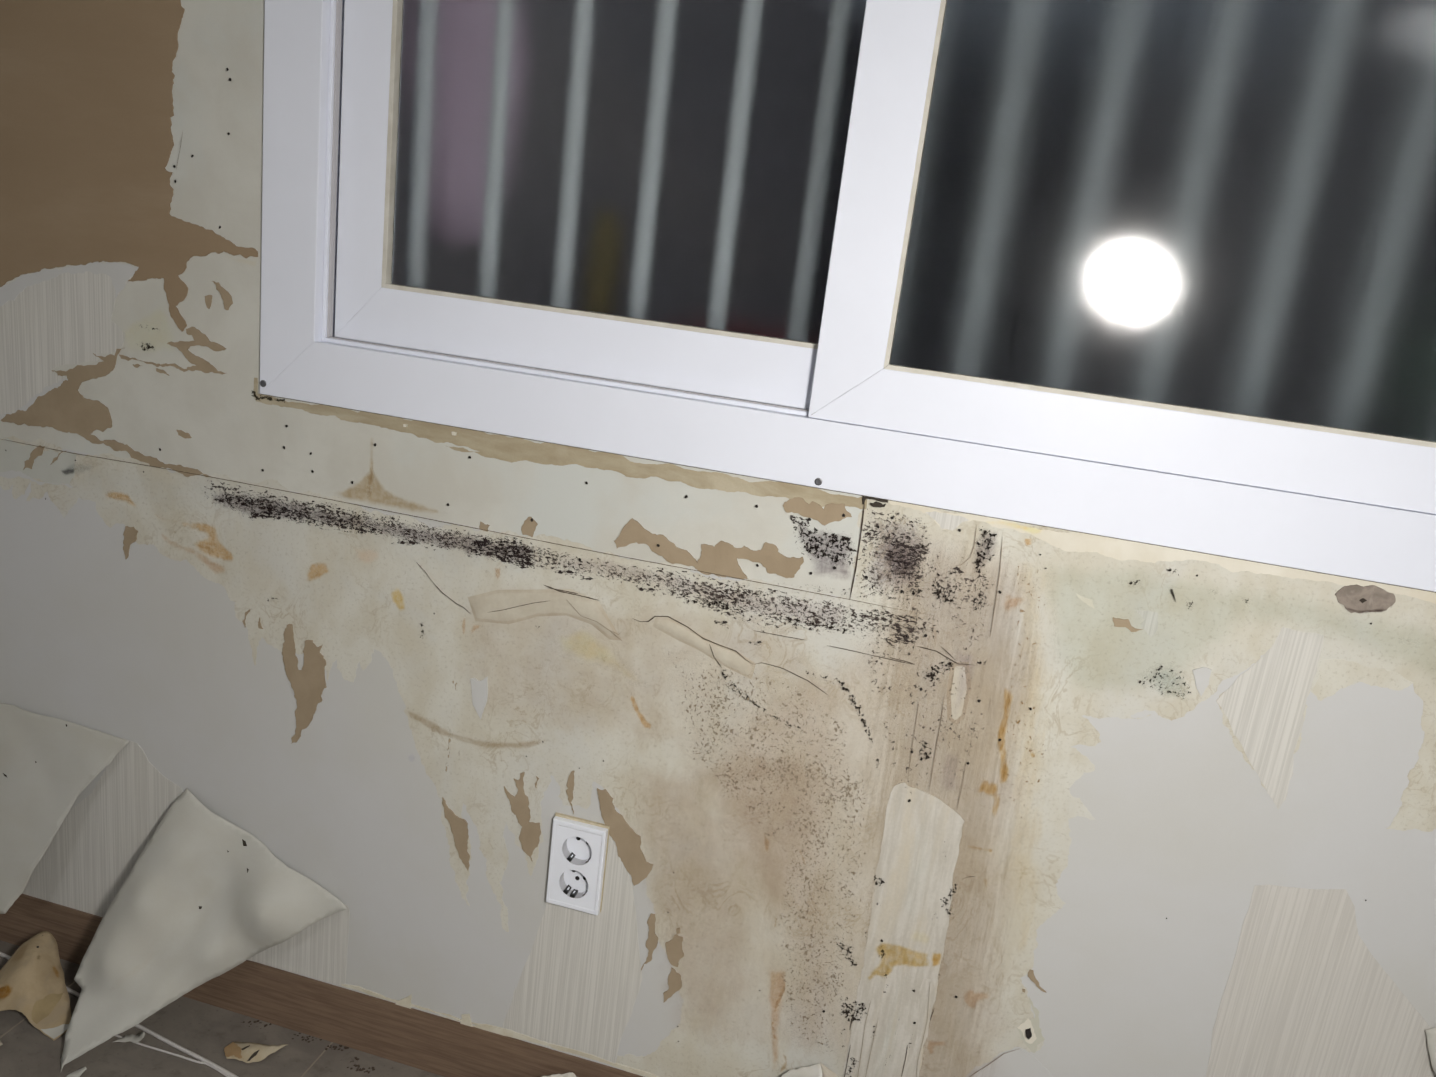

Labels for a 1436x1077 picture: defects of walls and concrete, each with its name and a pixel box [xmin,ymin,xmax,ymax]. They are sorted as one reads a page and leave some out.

flaking render [50,0,863,598]
leakage [204,481,997,1077]
peeling [0,420,1436,1077]